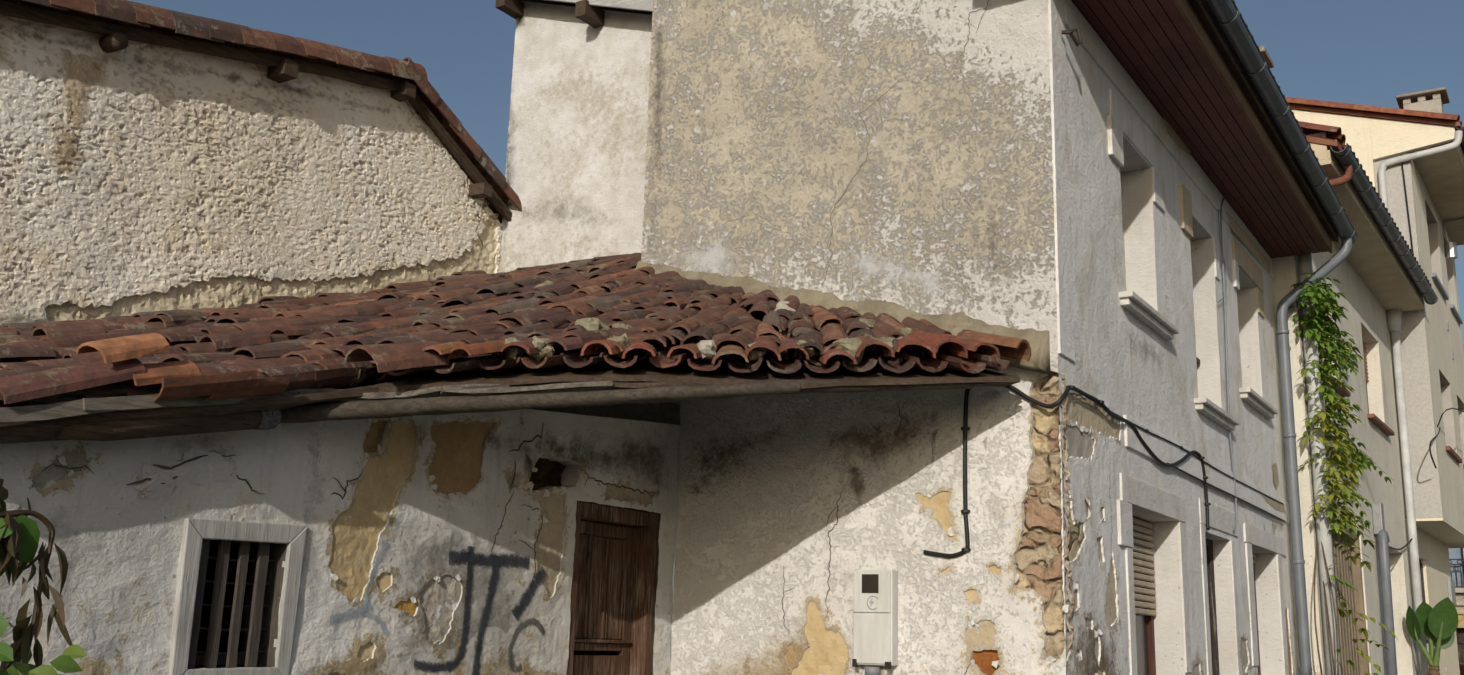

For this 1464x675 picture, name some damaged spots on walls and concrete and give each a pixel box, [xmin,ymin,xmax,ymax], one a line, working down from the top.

crack [822,81,898,289]
flaking render [328,416,495,603]
flaking render [395,573,461,646]
crack [782,481,844,634]
flaking render [785,601,849,675]
flaking render [916,491,955,539]
flaking render [965,589,1000,675]
spalling [989,372,1120,675]